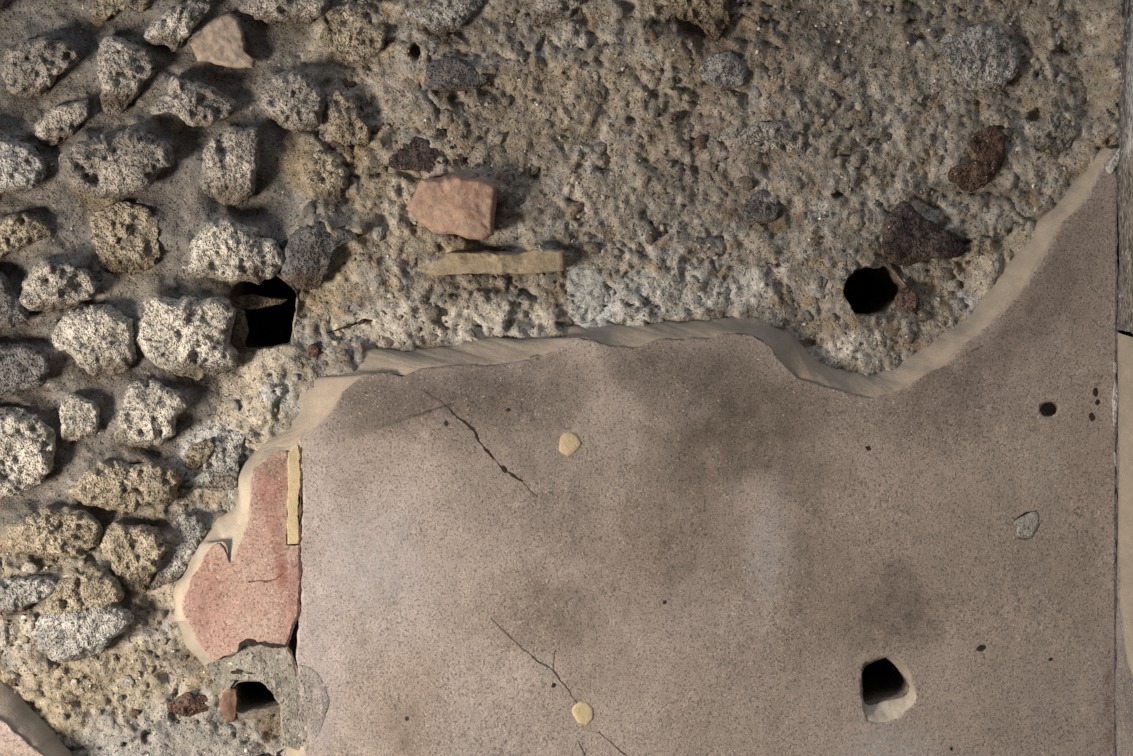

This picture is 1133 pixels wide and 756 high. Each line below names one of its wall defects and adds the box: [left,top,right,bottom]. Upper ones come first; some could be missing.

spalling [1106,148,1120,175]
spalling [131,221,152,236]
spalling [1089,357,1118,437]
crack [419,389,537,497]
spalling [1014,510,1040,540]
spalling [0,577,287,756]
spalling [205,620,330,750]
crack [490,618,577,703]
spalling [861,656,916,723]
crack [579,732,627,756]